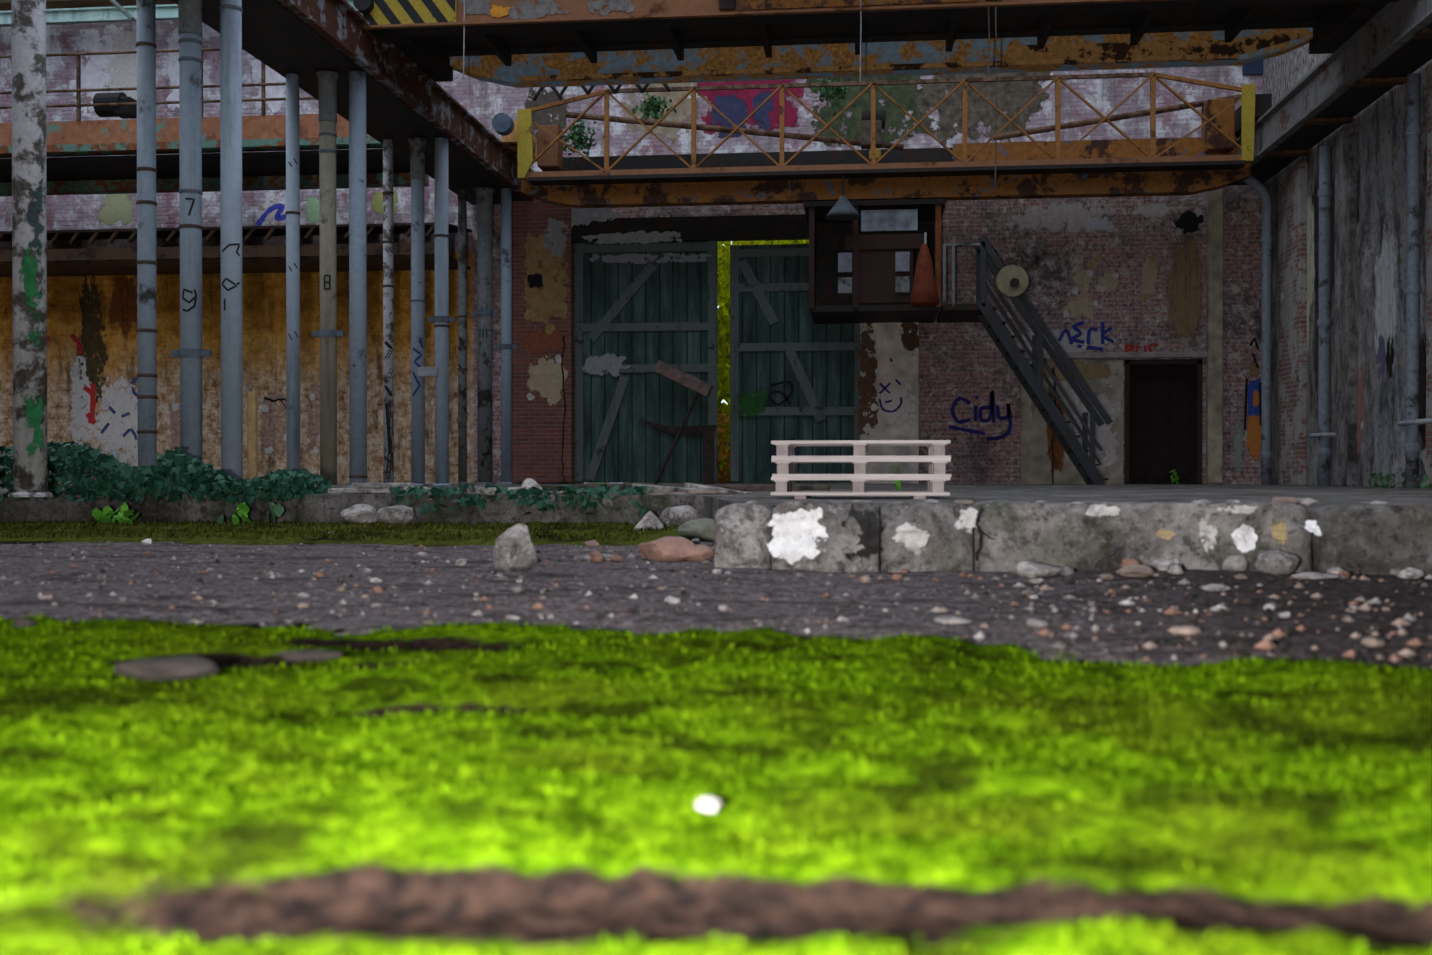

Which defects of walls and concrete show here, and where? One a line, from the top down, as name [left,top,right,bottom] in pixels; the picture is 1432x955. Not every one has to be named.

rust [490,5,511,18]
peeling [523,208,712,335]
water stain [76,276,109,402]
peeling [526,353,631,406]